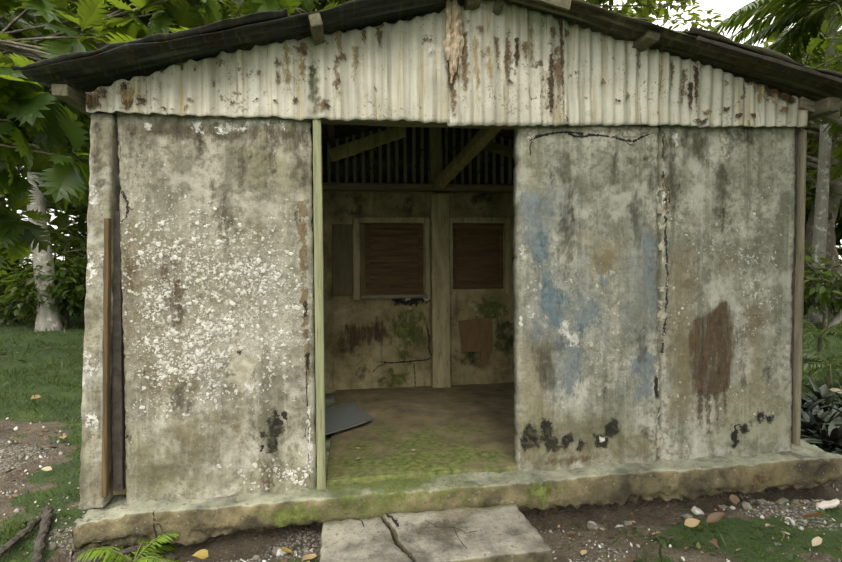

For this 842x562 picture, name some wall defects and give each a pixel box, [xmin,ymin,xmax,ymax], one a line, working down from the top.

corrosion [85,82,156,110]
corrosion [274,41,308,103]
corrosion [443,26,534,117]
corrosion [542,18,569,113]
corrosion [659,60,711,125]
corrosion [753,81,797,113]
crack [529,131,670,353]
crack [372,323,432,387]
water stain [259,409,288,454]
water stain [519,418,620,465]
water stain [731,412,774,448]